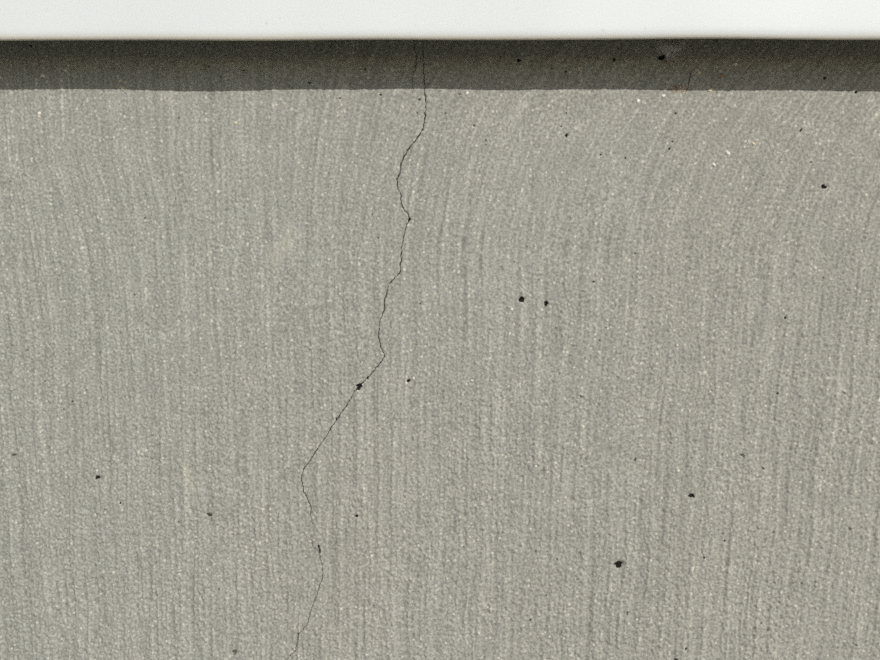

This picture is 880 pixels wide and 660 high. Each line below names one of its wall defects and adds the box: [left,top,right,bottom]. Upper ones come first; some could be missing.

crack [301,40,427,520]
crack [288,542,323,659]